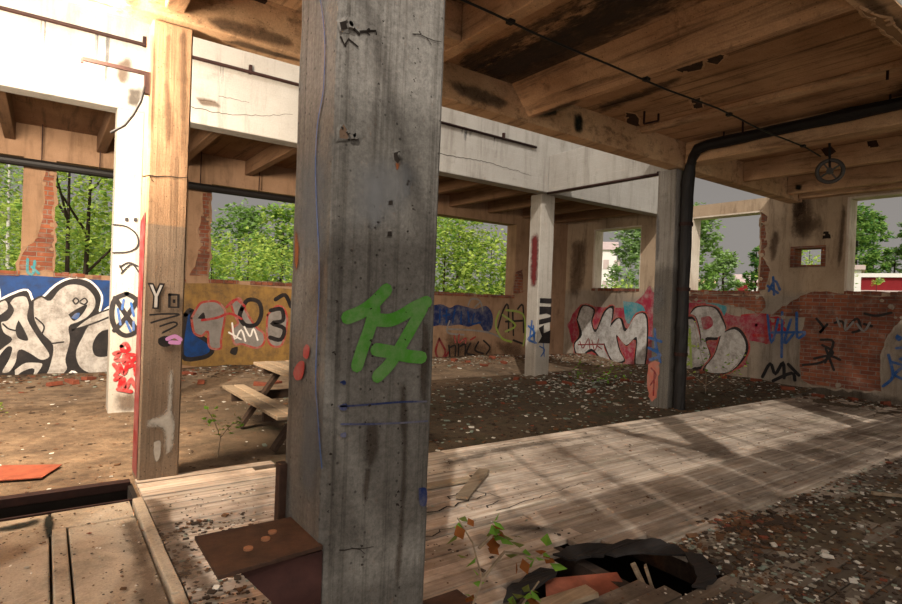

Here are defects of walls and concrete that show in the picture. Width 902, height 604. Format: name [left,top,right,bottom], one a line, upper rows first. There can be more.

damp [211,20,300,61]
damp [461,0,679,84]
damp [860,0,902,30]
damp [454,84,505,106]
damp [600,81,673,111]
peeling [15,169,59,275]
peeling [188,191,212,279]
peeling [689,210,902,393]